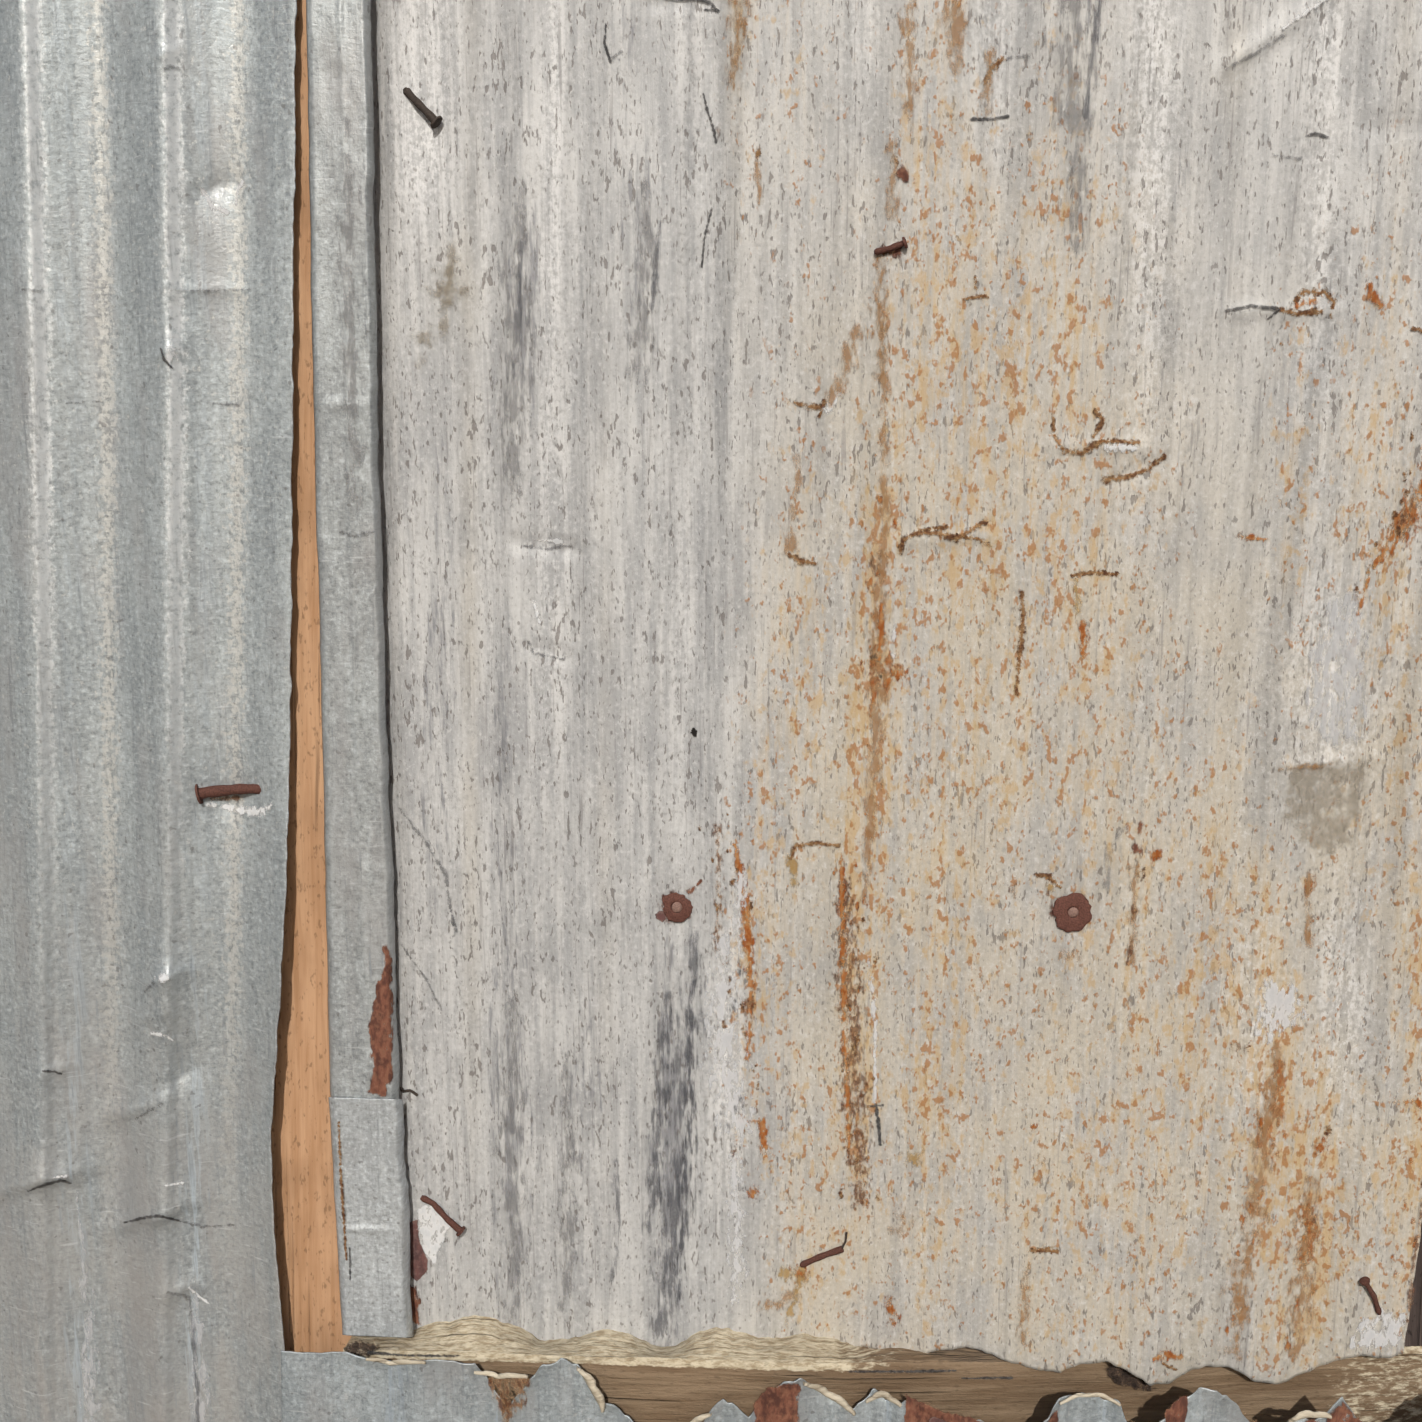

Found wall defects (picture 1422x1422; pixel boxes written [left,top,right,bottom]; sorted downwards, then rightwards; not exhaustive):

rust [886,141,909,215]
rust [872,244,902,402]
rust [1014,590,1026,695]
rust [1070,570,1119,659]
rust [1353,464,1422,616]
rust [786,425,909,1210]
rust [1126,822,1163,965]
rust [368,946,394,1096]
rust [1225,1042,1288,1359]
rust [1285,1176,1322,1358]
rust [753,1384,801,1422]
rust [1306,1402,1362,1422]